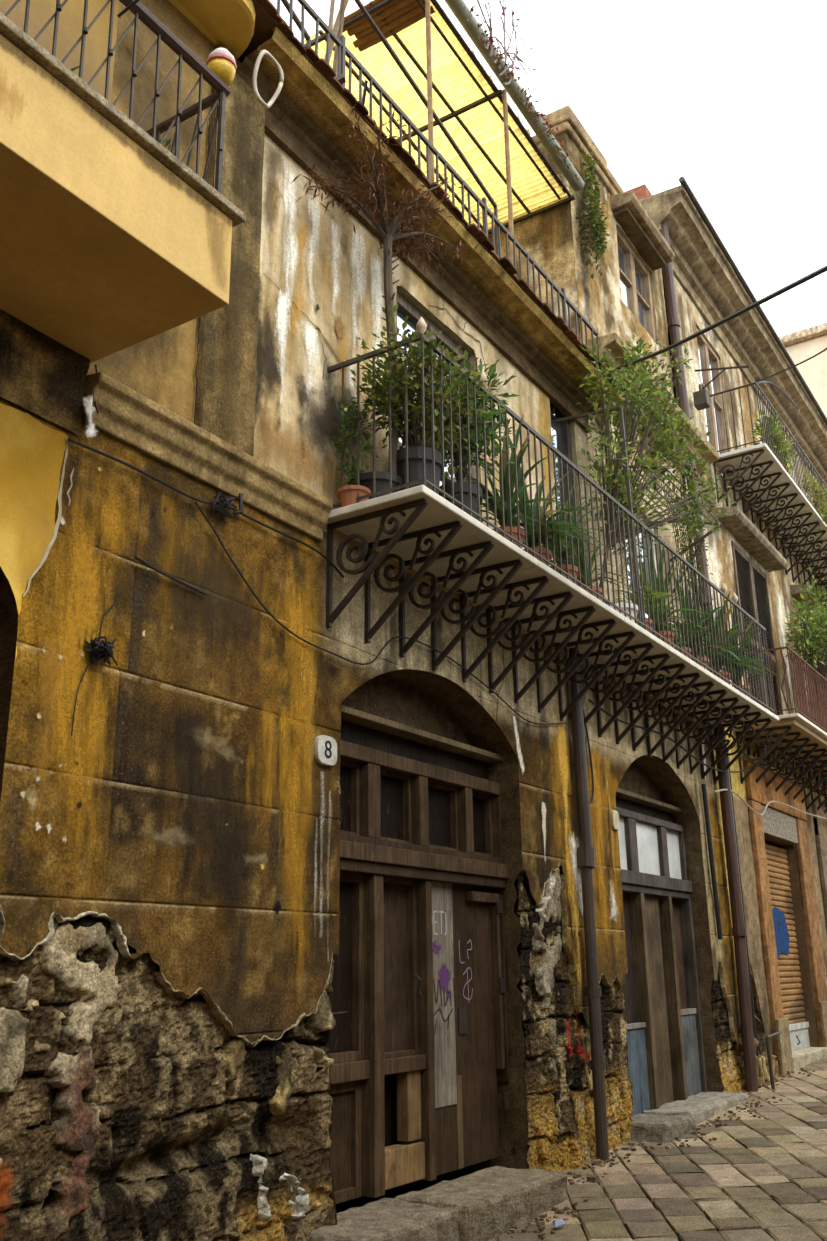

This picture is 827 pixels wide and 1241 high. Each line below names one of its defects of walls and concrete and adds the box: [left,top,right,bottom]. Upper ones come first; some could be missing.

leakage [84,93,383,486]
leakage [43,495,120,824]
leakage [265,587,312,891]
spalling [0,904,349,1241]
spalling [516,862,634,1171]
spalling [711,955,744,1093]
spalling [750,965,766,1056]